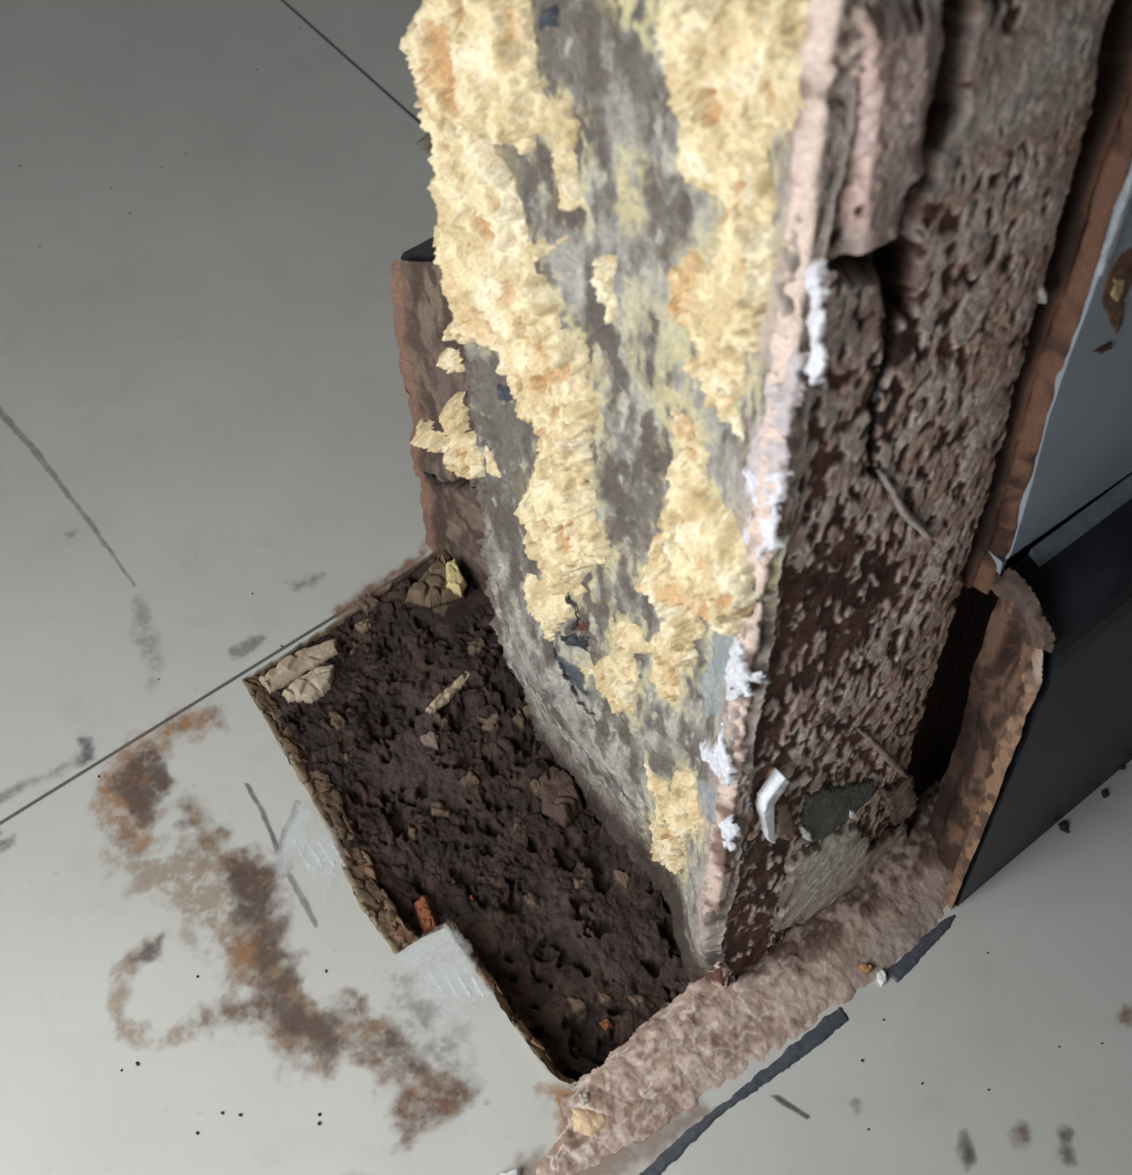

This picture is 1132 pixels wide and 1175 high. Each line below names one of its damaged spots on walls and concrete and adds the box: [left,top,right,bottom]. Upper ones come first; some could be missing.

flaking render [463,0,1113,988]
crack [866,318,889,471]
corrosion [99,712,213,850]
corrosion [187,805,470,1141]
spalling [242,674,578,1088]